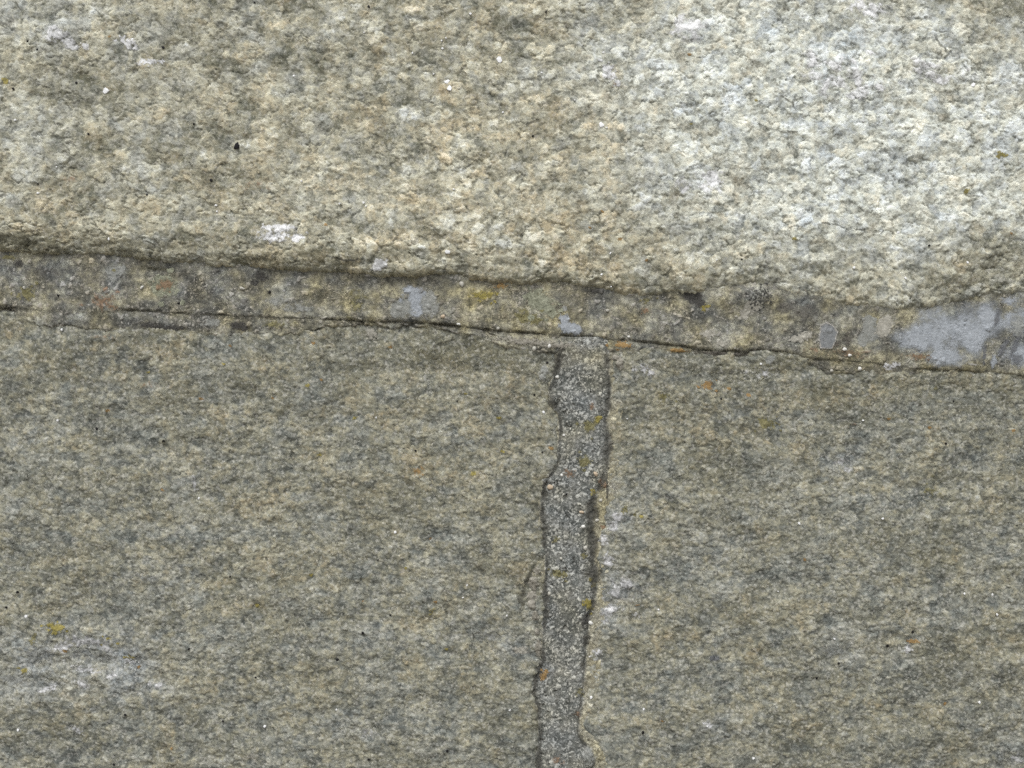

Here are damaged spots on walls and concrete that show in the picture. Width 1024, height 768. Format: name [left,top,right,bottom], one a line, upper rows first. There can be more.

crack [103,309,579,433]
crack [797,359,976,374]